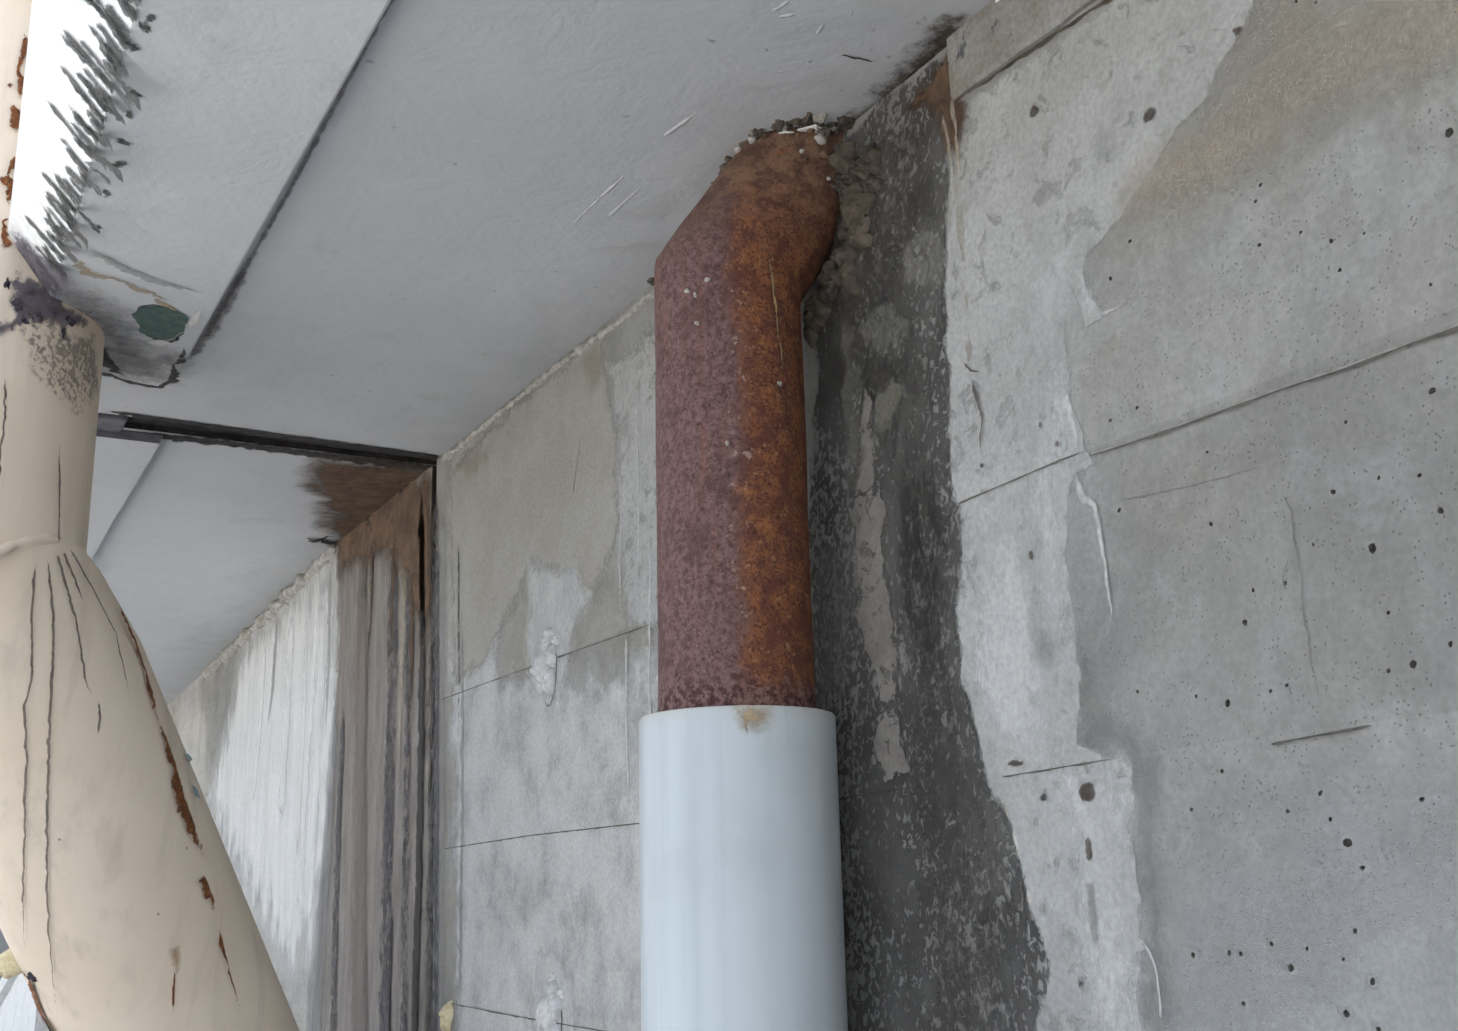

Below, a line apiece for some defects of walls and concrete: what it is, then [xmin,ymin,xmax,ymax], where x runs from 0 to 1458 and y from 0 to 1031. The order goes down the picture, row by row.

rust [7,34,28,133]
rust [0,157,16,247]
peeling [73,254,201,347]
rust [769,257,783,364]
crack [21,449,128,989]
rust [119,604,205,858]
water stain [209,329,658,1031]
rust [198,876,214,910]
rust [22,970,50,1031]
rust [219,934,238,1001]